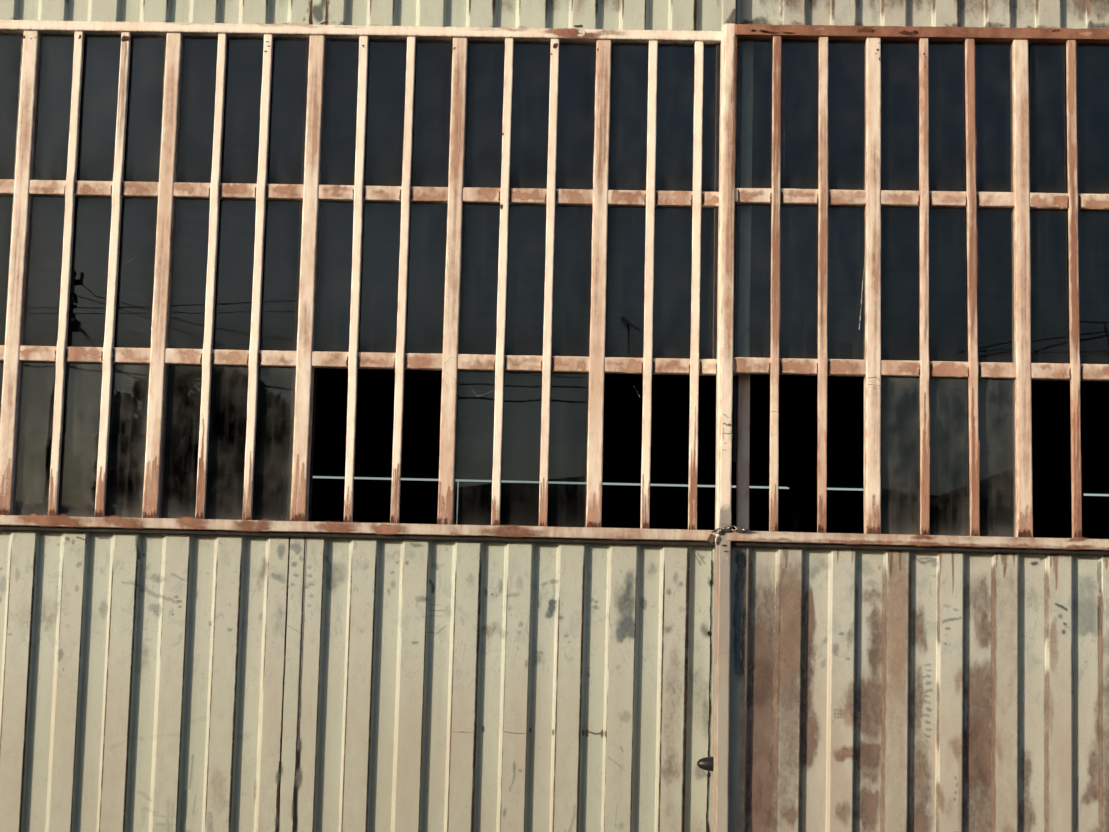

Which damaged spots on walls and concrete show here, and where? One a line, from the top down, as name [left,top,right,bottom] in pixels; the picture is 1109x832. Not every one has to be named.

rust [478,187,585,203]
rust [612,0,1109,354]
rust [55,347,148,362]
rust [688,426,697,530]
rust [770,485,788,568]
rust [726,296,859,374]
rust [799,577,818,803]
rust [818,388,983,832]
rust [899,362,1000,378]
rust [954,506,1033,832]
rust [1044,393,1090,633]
rust [1084,594,1109,832]